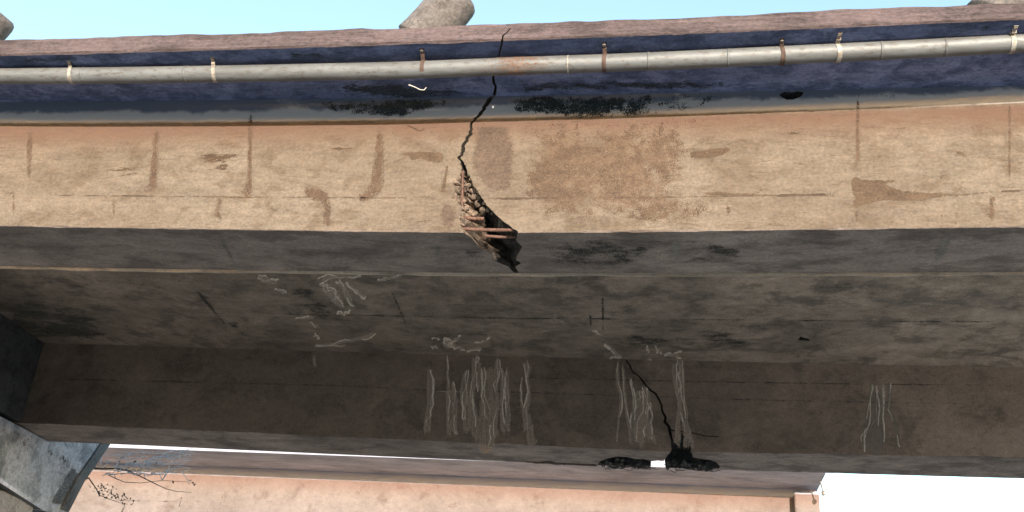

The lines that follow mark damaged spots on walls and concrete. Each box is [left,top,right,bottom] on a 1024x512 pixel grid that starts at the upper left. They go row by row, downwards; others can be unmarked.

crack [457,28,511,176]
damp [511,80,732,119]
peeling [436,119,714,273]
damp [318,274,367,315]
damp [295,315,376,367]
damp [424,335,538,454]
damp [592,330,656,448]
spalling [598,432,721,473]
damp [646,346,695,449]
crack [475,359,937,441]
damp [860,383,902,455]